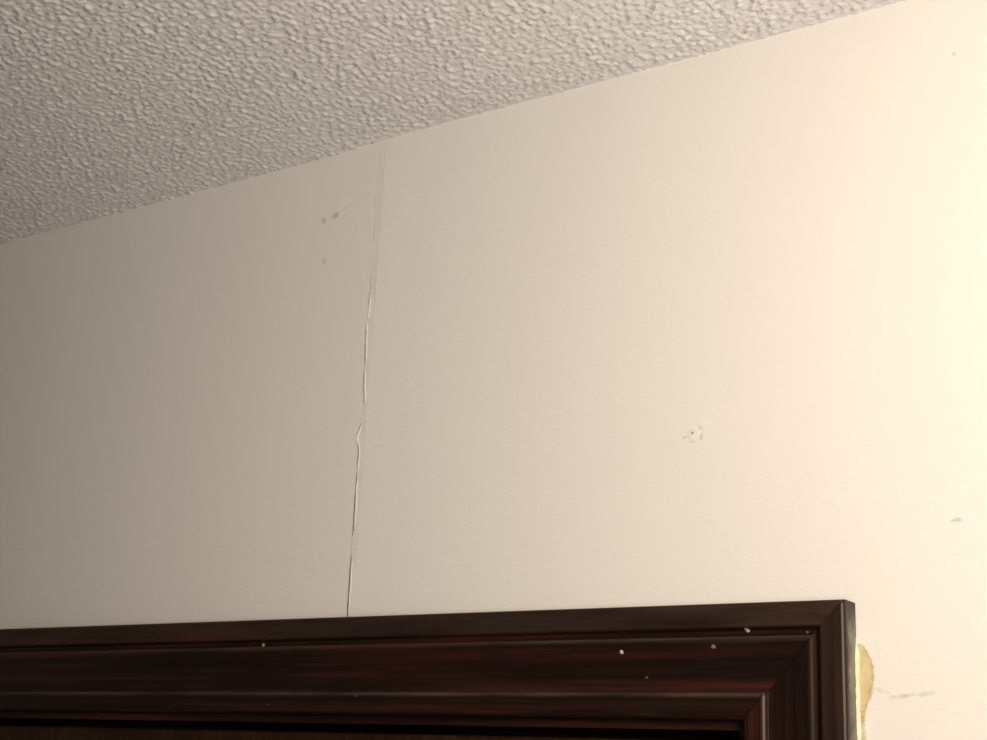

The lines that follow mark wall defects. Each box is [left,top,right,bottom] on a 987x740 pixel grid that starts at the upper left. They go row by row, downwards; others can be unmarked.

crack [347,148,380,617]